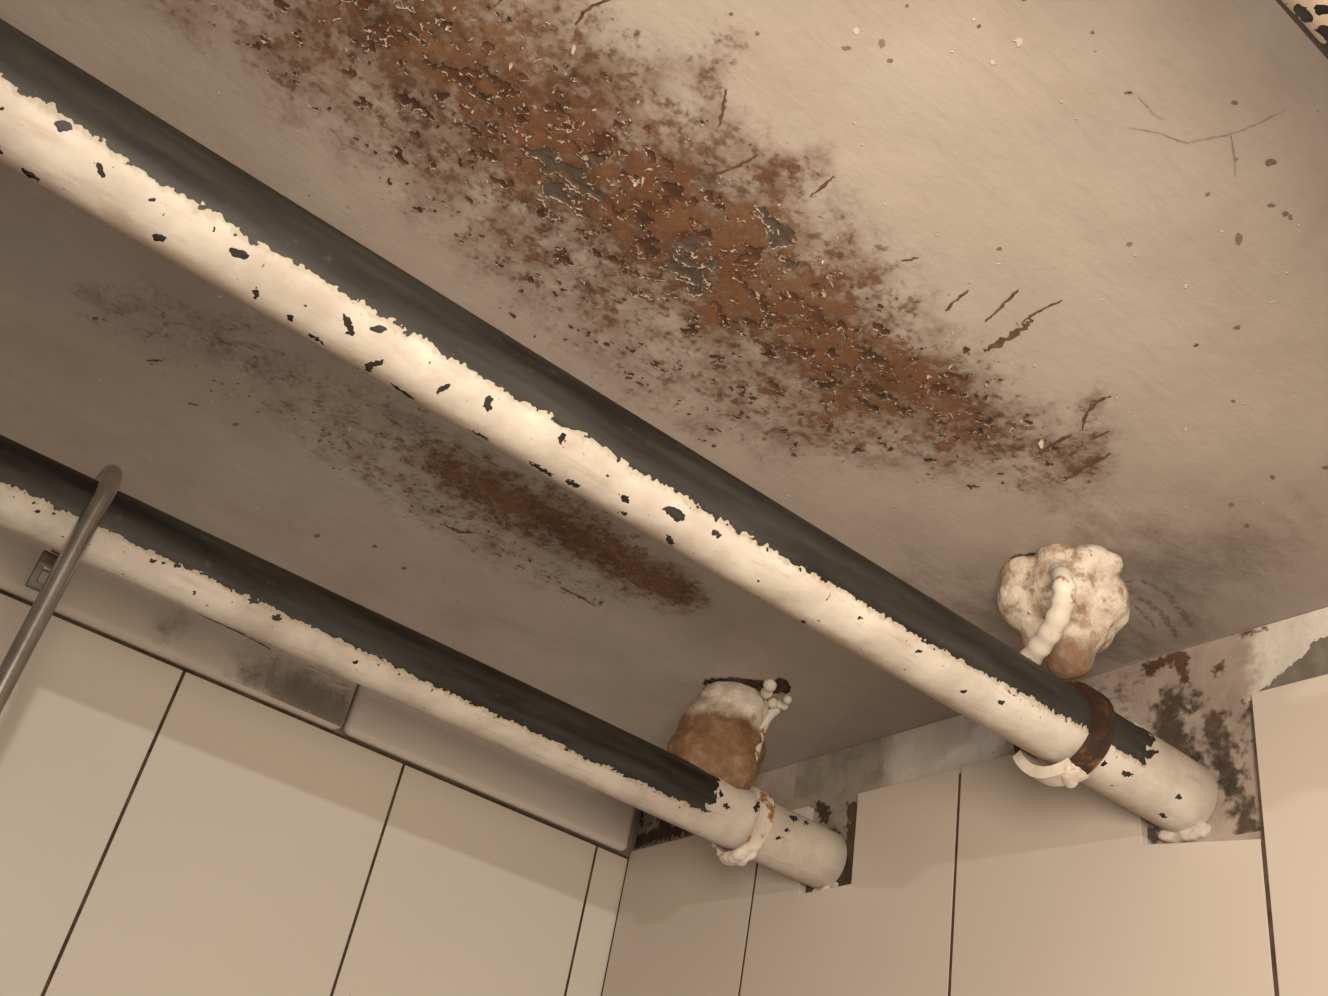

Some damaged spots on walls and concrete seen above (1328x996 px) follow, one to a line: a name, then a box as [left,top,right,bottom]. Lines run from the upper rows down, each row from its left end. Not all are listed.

rust [236,0,1121,489]
rust [145,357,706,607]
flaking render [1249,636,1328,710]
water stain [1150,688,1261,835]
water stain [1147,827,1165,844]